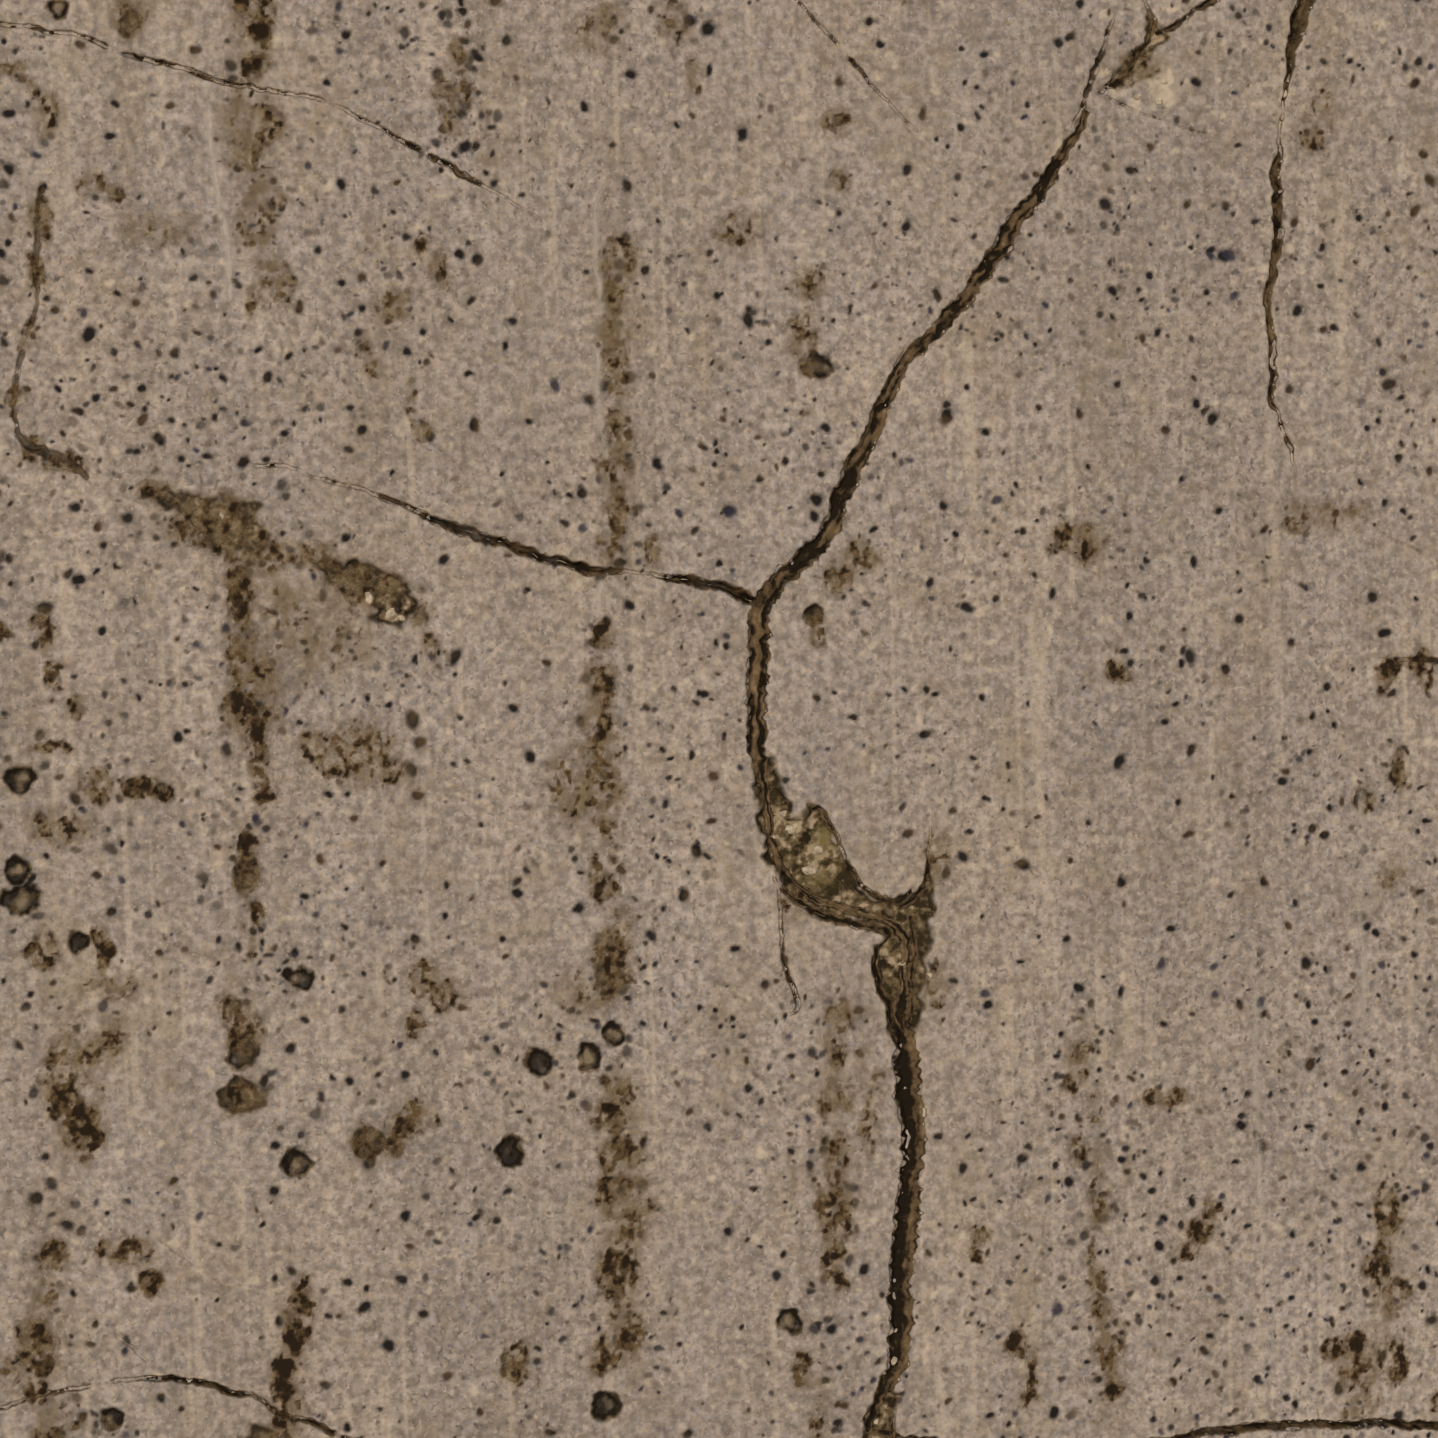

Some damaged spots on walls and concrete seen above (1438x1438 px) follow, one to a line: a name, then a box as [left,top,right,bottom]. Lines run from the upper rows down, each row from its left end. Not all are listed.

crack [0,21,502,195]
crack [1263,0,1313,463]
crack [10,186,89,479]
crack [321,0,1220,1438]
crack [1401,656,1438,664]
crack [0,1343,350,1438]
crack [1156,1418,1438,1438]